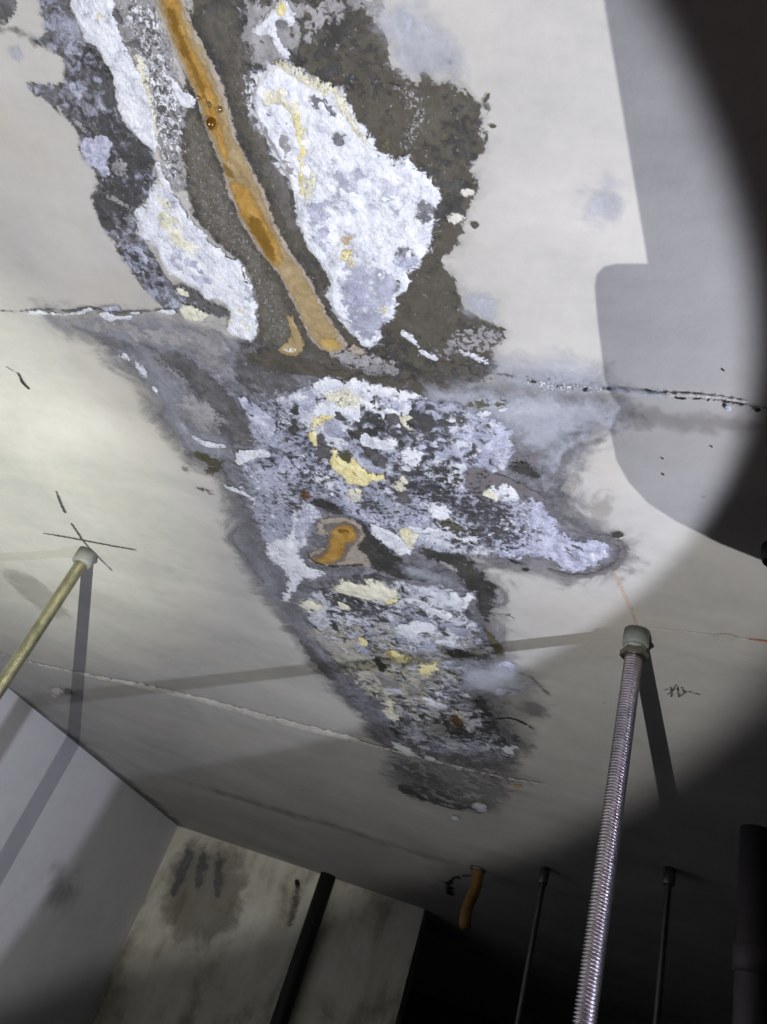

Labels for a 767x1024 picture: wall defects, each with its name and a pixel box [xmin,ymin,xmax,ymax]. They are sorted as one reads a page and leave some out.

rust [155,0,348,352]
crack [0,304,179,322]
leakage [26,0,630,820]
crack [495,374,767,412]
rust [307,499,374,569]
leakage [171,849,222,897]